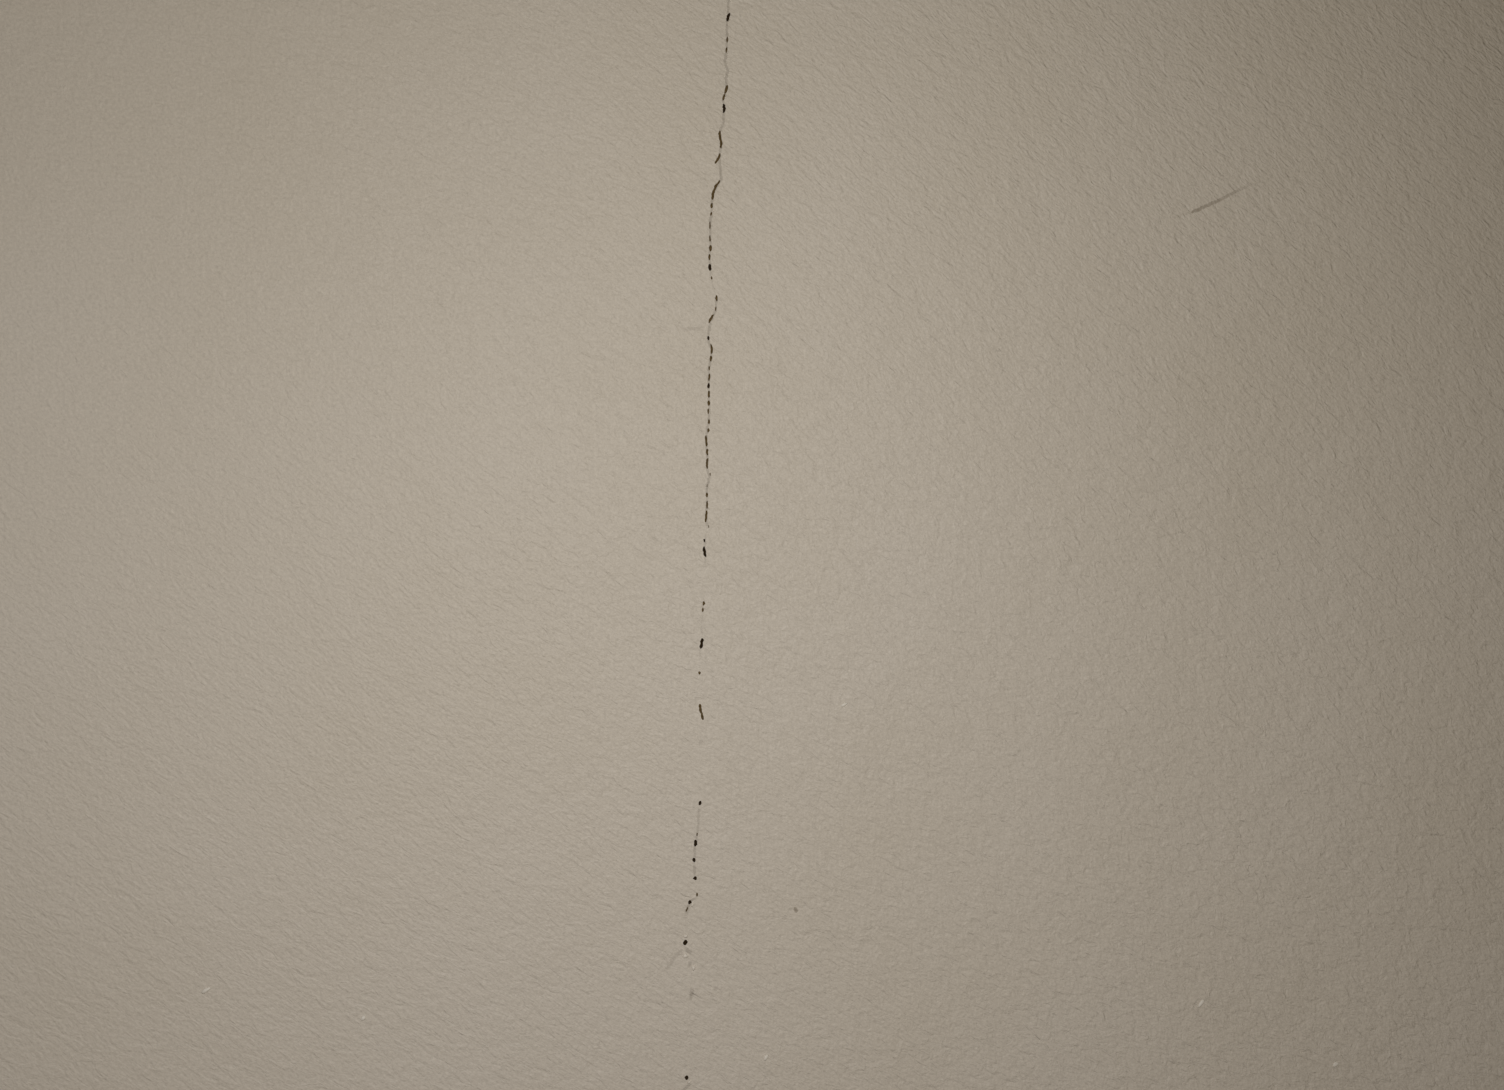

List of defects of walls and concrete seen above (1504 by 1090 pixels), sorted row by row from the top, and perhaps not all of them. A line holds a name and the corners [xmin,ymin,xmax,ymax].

crack [703,13,730,557]
crack [697,601,705,720]
crack [683,801,701,971]